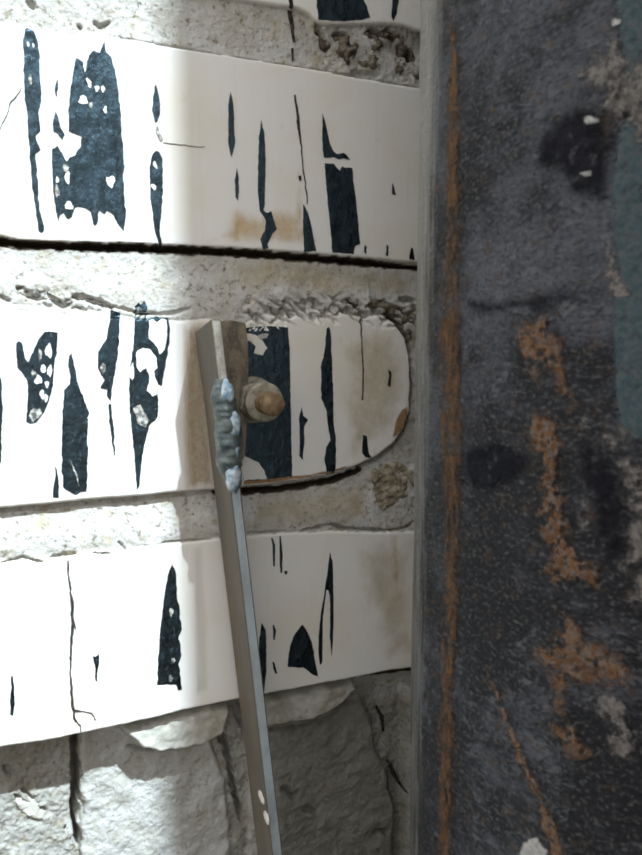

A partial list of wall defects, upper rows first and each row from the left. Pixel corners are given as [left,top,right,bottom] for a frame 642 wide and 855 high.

peeling [23,28,44,233]
peeling [52,40,126,231]
peeling [16,288,120,455]
peeling [53,353,89,498]
peeling [129,301,170,490]
corrosion [439,25,461,855]
corrosion [515,317,574,408]
corrosion [529,415,599,586]
crack [67,560,96,732]
peeling [157,565,182,690]
corrosion [487,673,563,855]
corrosion [534,616,635,759]